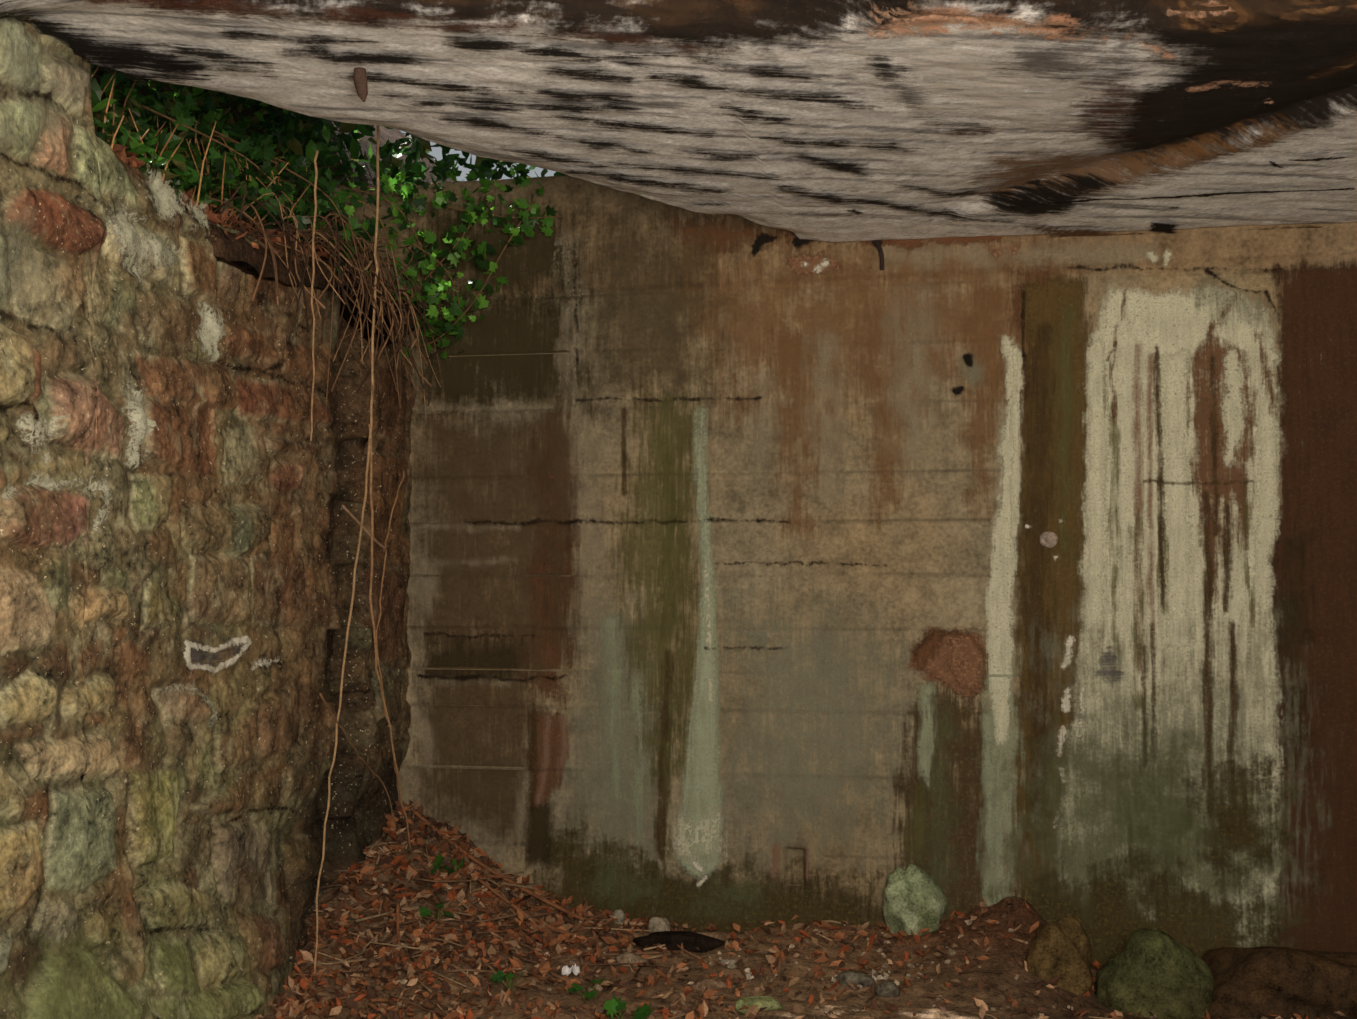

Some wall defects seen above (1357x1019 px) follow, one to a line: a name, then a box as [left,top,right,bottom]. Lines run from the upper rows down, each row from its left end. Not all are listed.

damp [71,0,1151,223]
damp [1187,80,1267,92]
damp [409,199,905,933]
damp [967,243,1357,953]
corrosion [1187,297,1276,817]